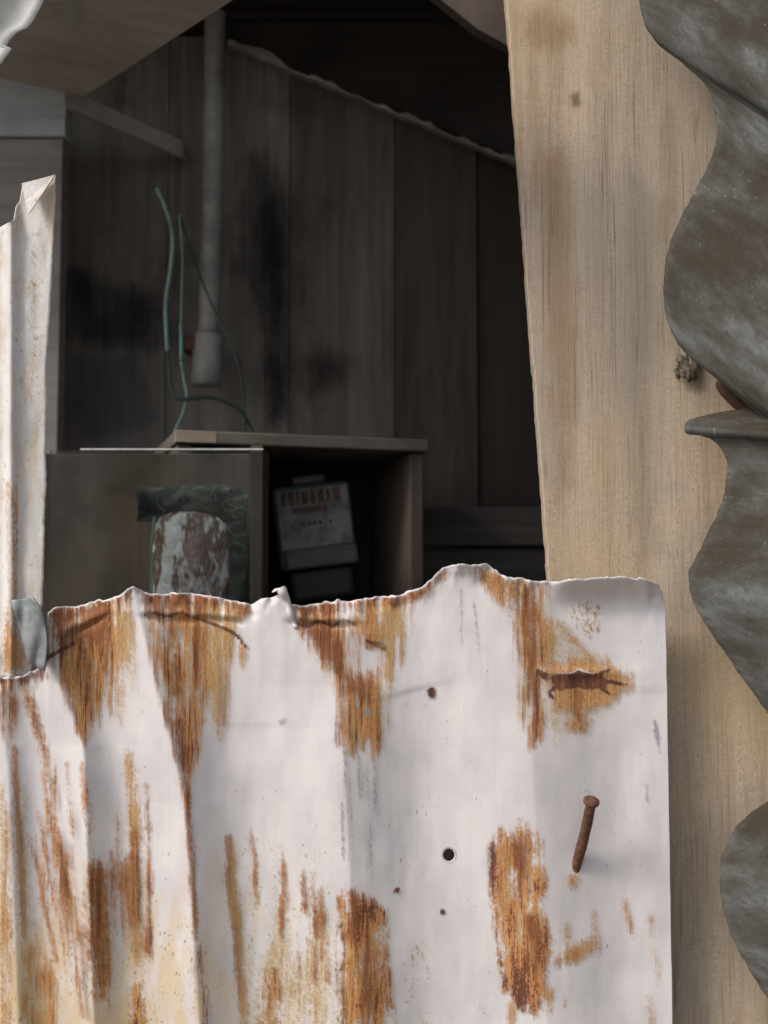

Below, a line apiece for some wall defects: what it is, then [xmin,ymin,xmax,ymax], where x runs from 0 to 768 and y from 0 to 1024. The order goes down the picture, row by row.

rust [7,483,18,600]
rust [295,570,446,760]
rust [474,569,633,748]
peeling [536,668,628,699]
rust [0,589,250,1024]
rust [225,834,430,1024]
rust [489,823,601,1024]